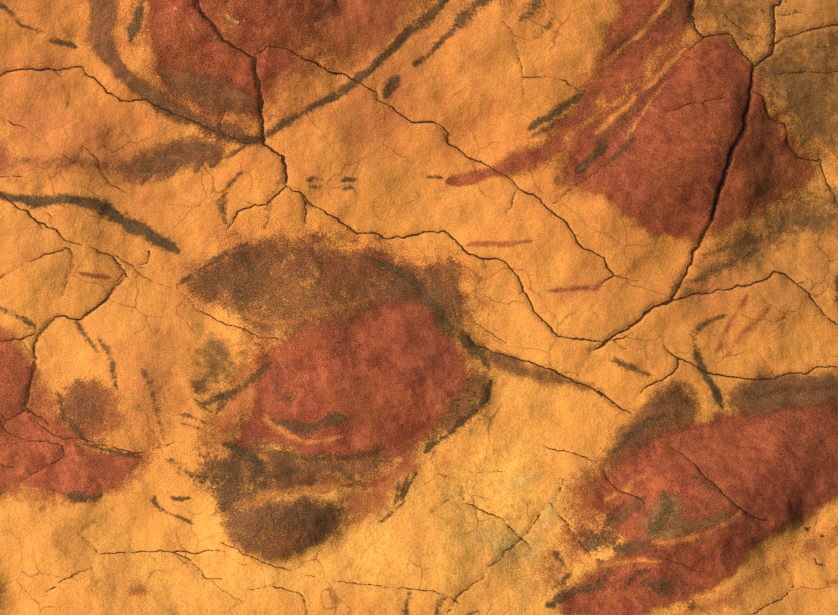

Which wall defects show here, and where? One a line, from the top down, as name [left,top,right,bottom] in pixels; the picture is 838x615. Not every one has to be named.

crack [0,0,838,350]
crack [0,175,177,480]
crack [183,294,297,375]
crack [469,313,631,414]
crack [640,348,837,393]
crack [544,446,645,504]
crack [670,447,766,521]
crack [46,542,313,614]
crack [336,471,590,615]